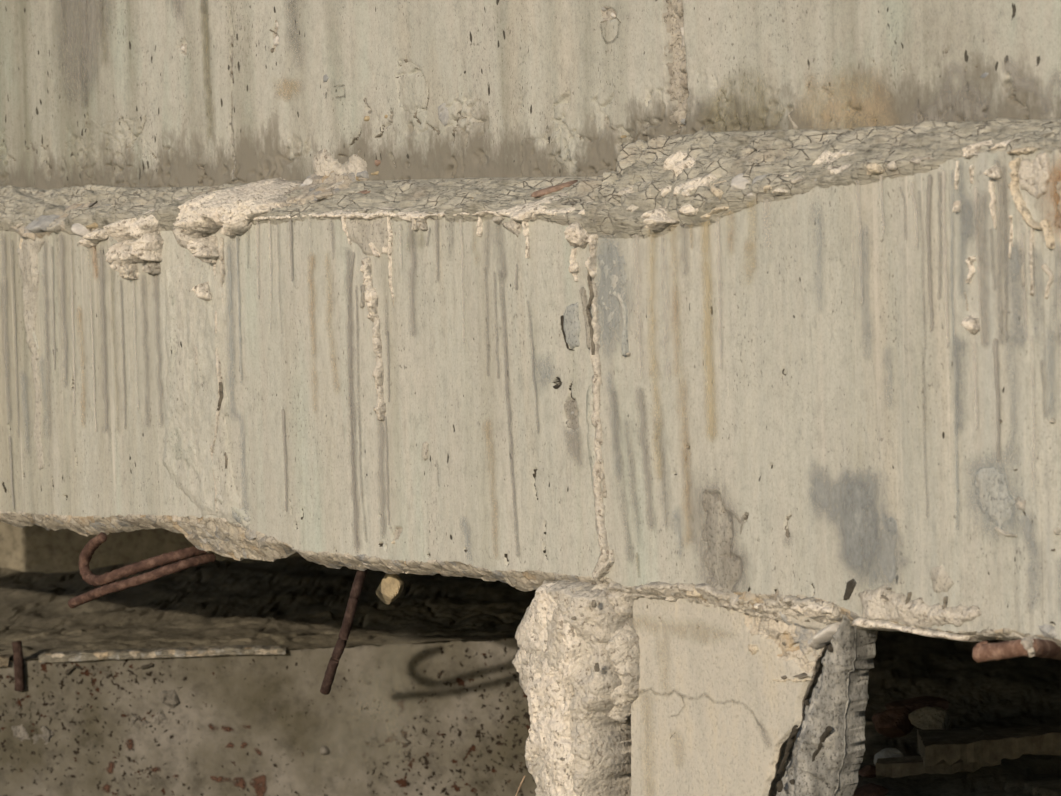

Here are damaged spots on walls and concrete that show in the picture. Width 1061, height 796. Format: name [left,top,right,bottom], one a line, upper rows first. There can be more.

spalling [10,199,108,241]
spalling [282,170,370,206]
spalling [531,180,578,198]
spalling [618,151,773,231]
leakage [812,149,855,175]
leakage [866,159,897,200]
leakage [909,139,1061,357]
rust [1053,170,1061,229]
leakage [964,187,1007,460]
leakage [812,475,897,583]
spalling [744,615,841,683]
spalling [908,707,950,729]